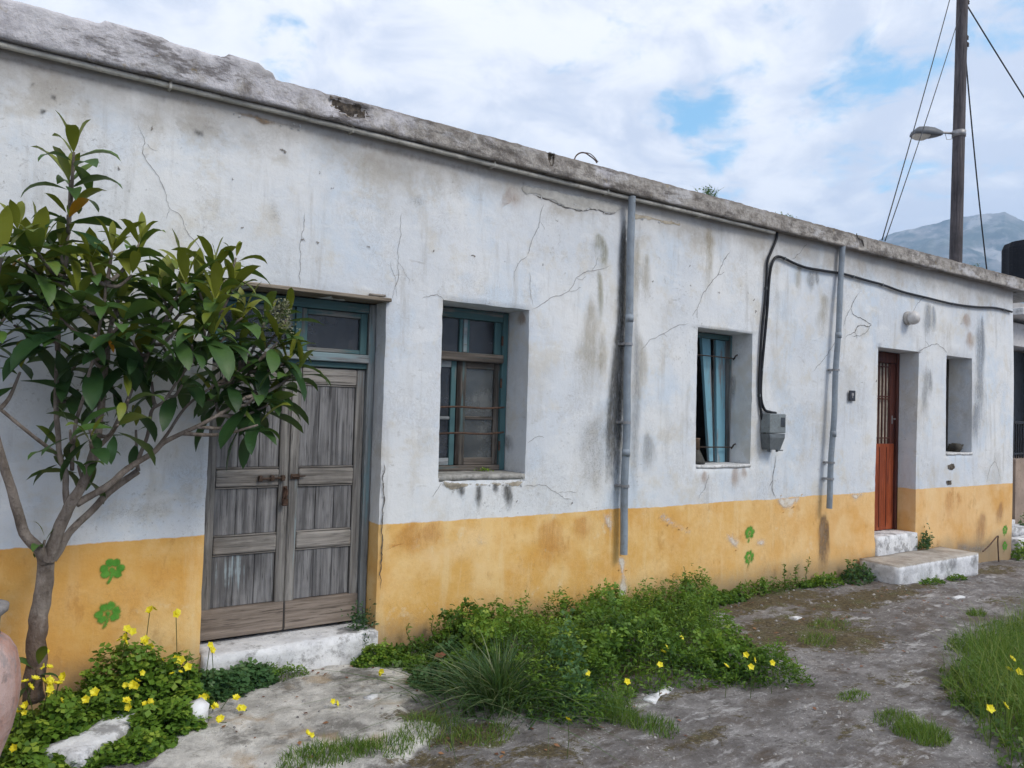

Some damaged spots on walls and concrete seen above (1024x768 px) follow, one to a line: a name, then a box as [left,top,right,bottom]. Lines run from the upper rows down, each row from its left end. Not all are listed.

spalling [330,95,369,118]
crack [139,128,205,257]
crack [390,218,445,301]
crack [514,205,607,309]
damp [607,227,627,457]
crack [642,256,727,349]
crack [814,293,871,371]
crack [378,466,386,588]